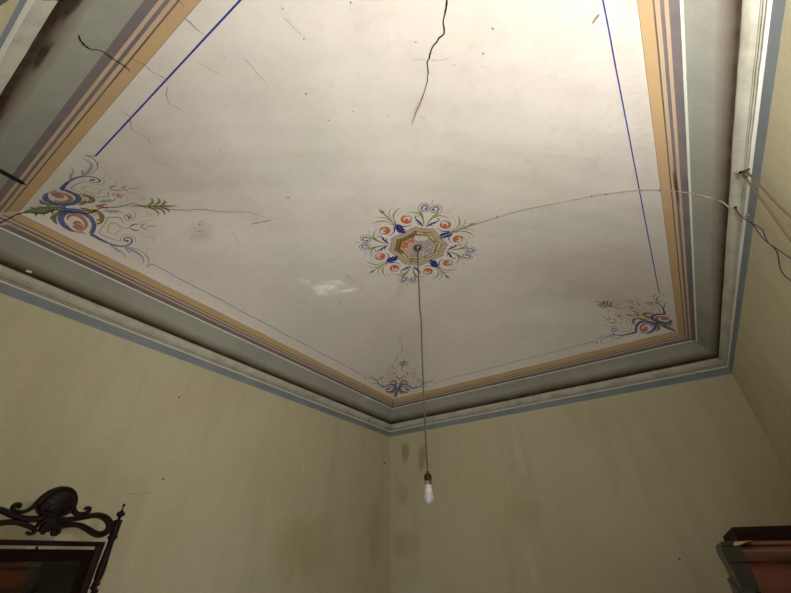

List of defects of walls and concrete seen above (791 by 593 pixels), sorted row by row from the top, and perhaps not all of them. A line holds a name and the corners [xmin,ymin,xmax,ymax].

crack [78,35,184,113]
crack [412,0,451,122]
crack [0,203,219,224]